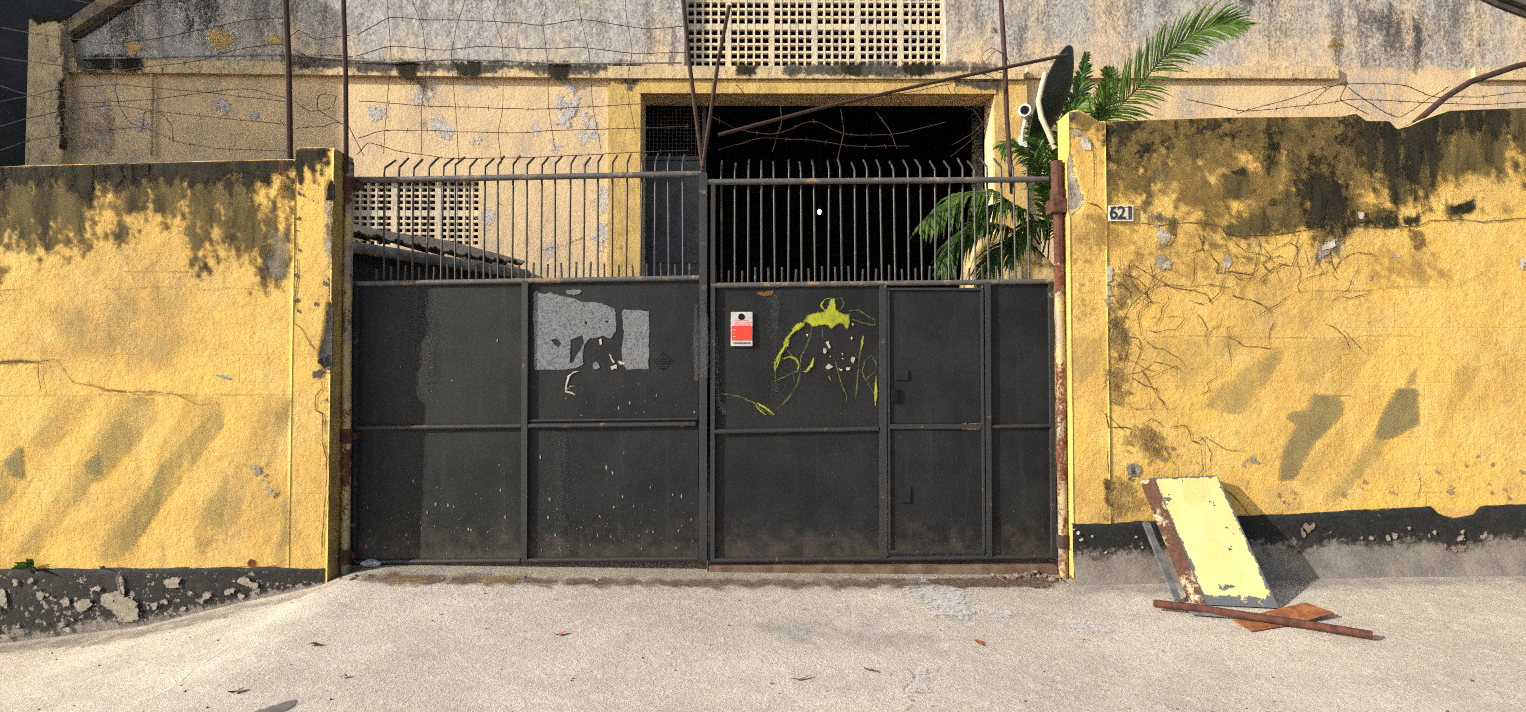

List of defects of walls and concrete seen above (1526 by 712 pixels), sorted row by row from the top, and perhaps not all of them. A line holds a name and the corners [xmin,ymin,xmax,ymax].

damp [156,0,219,38]
damp [1352,2,1444,66]
damp [280,52,642,94]
damp [734,61,761,76]
damp [782,59,1001,90]
damp [0,13,330,296]
damp [1070,108,1526,290]
crack [1070,128,1526,519]
peeling [0,576,259,635]